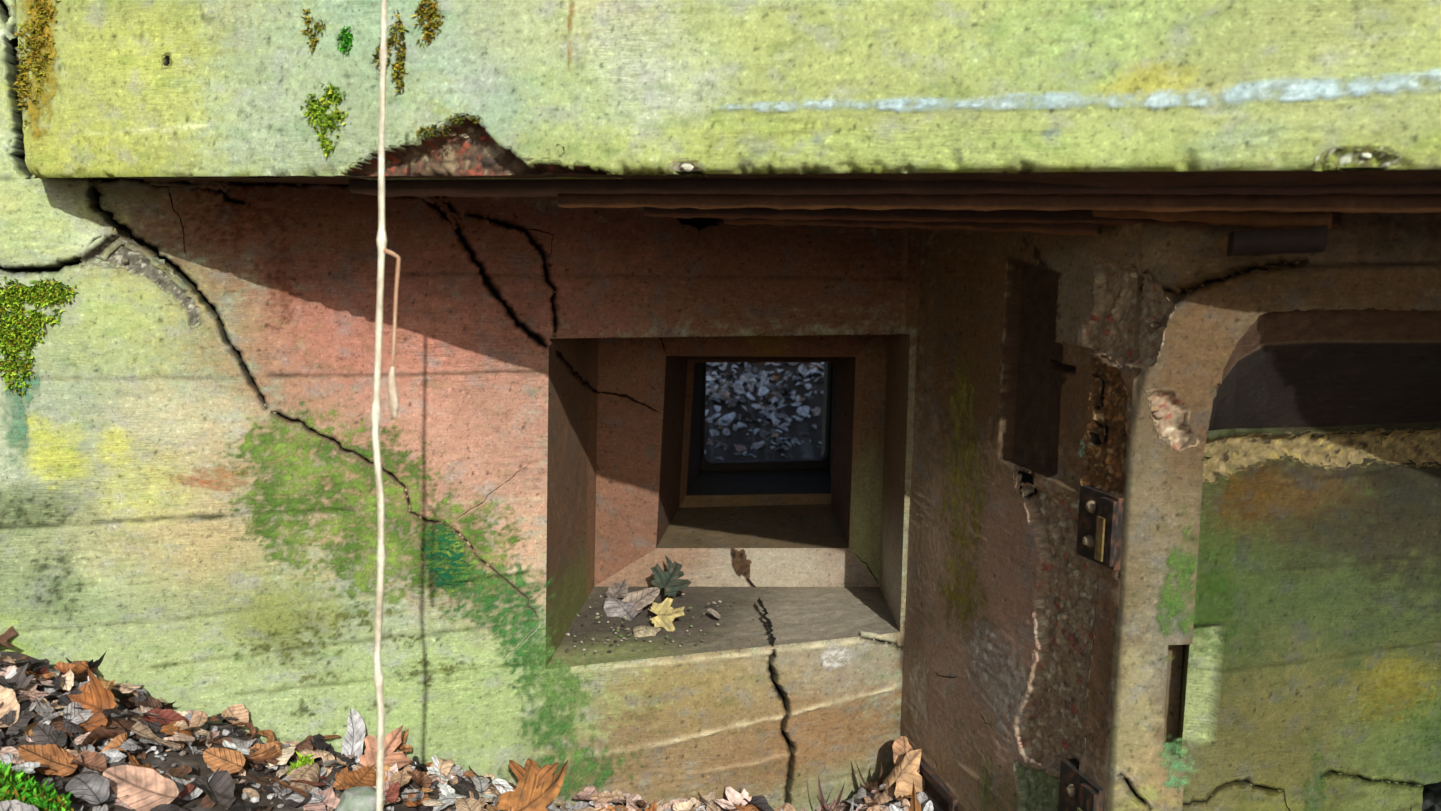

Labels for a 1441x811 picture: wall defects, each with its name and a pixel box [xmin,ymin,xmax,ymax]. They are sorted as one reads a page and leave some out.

crack [0,0,35,178]
spalling [341,113,623,176]
crack [0,176,659,661]
spalling [1145,386,1441,484]
spalling [1011,252,1176,811]
leakage [235,602,372,682]
leakage [402,660,474,686]
crack [746,578,798,806]
crack [1116,770,1291,811]
crack [1320,766,1425,791]